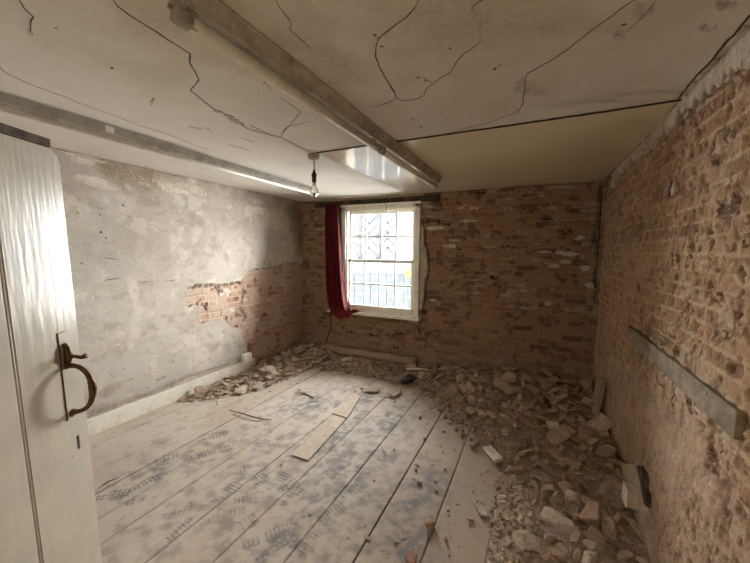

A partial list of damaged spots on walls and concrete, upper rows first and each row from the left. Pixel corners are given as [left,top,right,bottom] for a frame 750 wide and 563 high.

crack [0,0,367,153]
crack [371,0,482,108]
crack [396,0,750,142]
crack [591,134,649,301]
flaking render [184,261,304,365]
spalling [709,291,748,346]